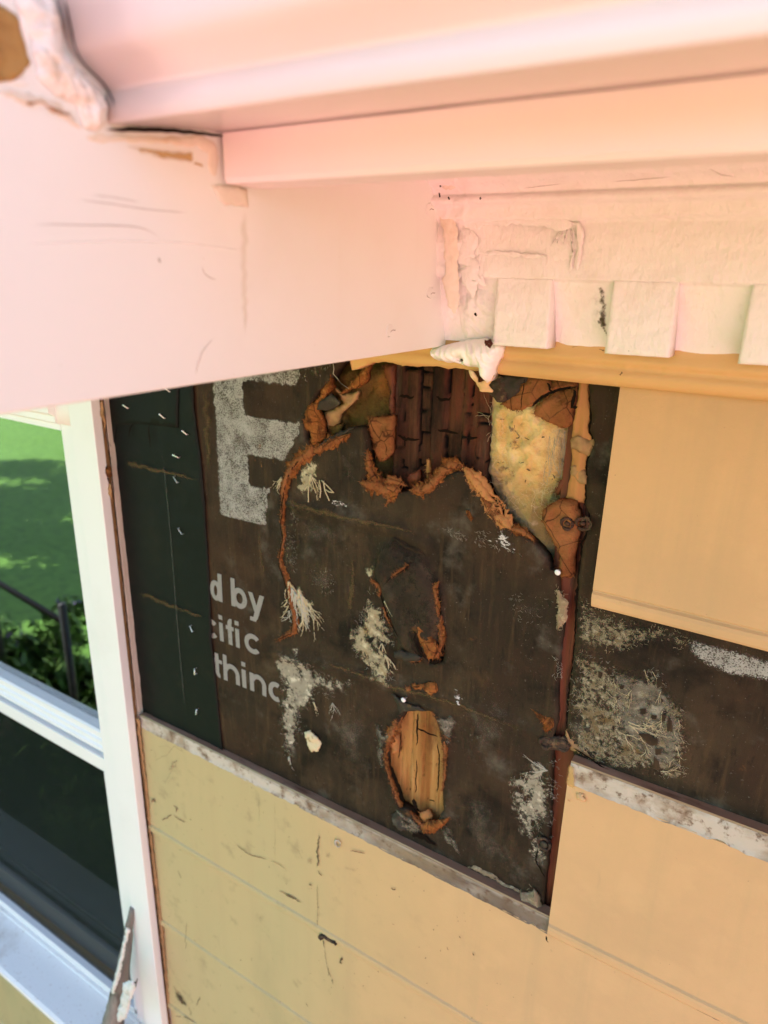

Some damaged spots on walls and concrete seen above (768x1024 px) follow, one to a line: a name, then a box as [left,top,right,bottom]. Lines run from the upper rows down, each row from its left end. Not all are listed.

peeling [0,5,81,129]
peeling [302,363,398,462]
peeling [468,369,495,393]
peeling [500,377,578,428]
damp [276,568,431,769]
mould [567,603,689,778]
peeling [419,808,434,823]
damp [509,754,552,866]